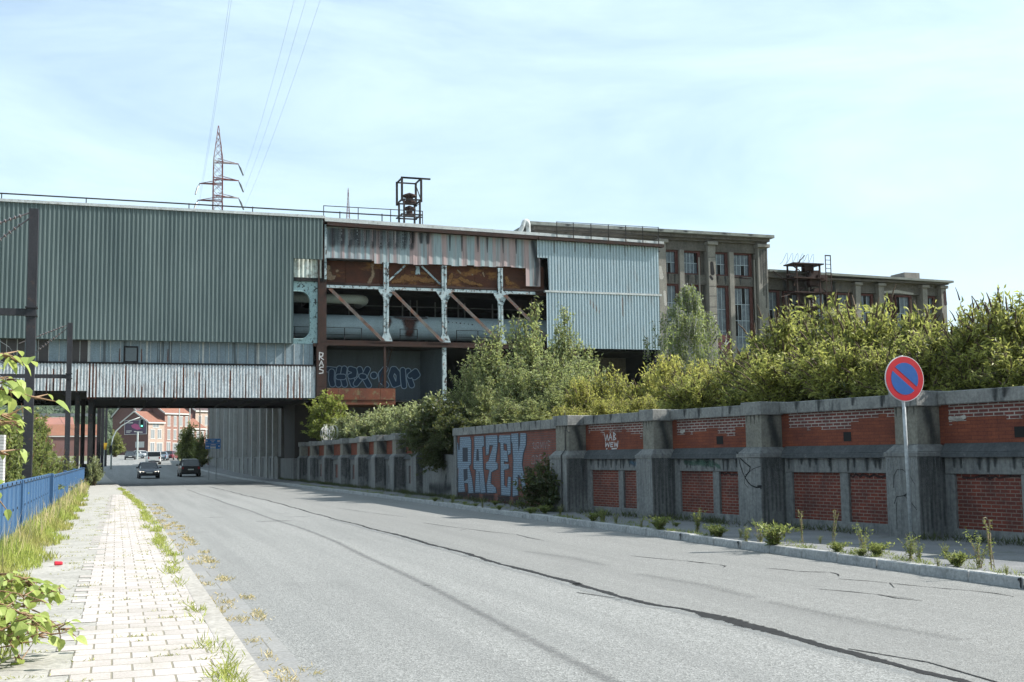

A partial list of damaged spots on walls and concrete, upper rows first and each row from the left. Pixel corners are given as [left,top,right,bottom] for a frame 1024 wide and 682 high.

peeling [391,270,485,287]
corrosion [76,364,97,398]
corrosion [111,349,185,399]
corrosion [276,368,303,399]